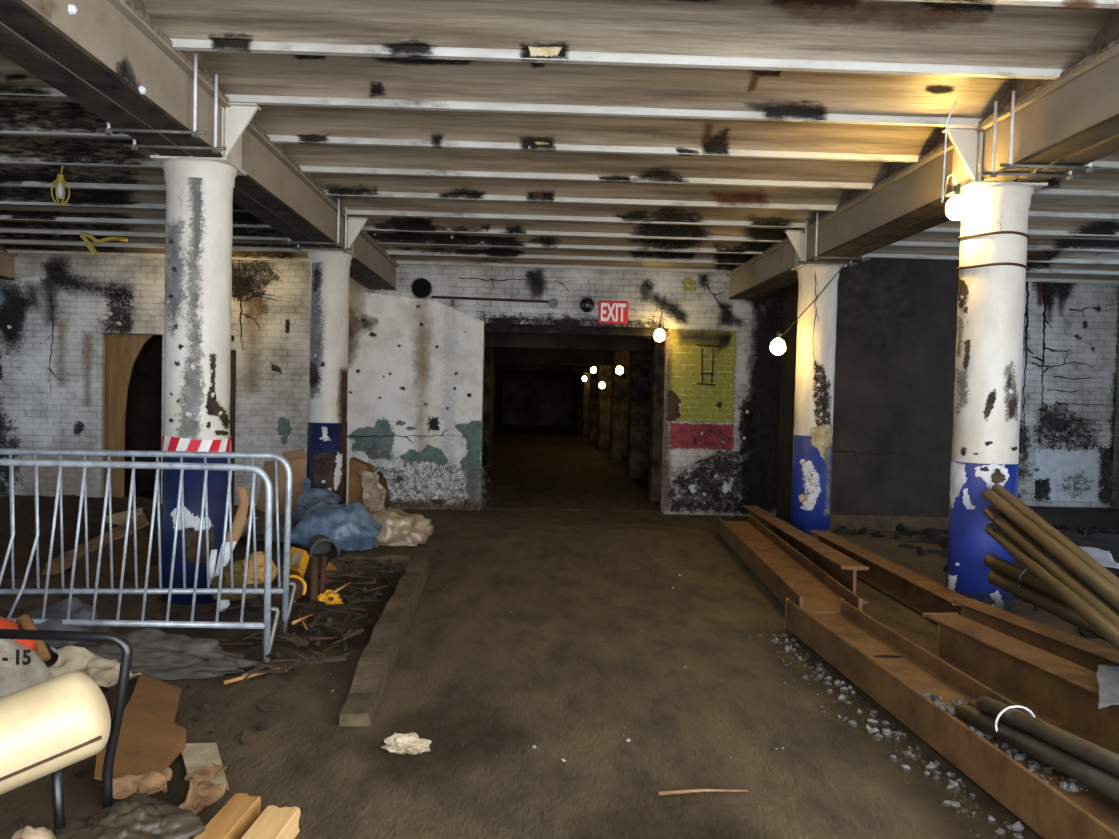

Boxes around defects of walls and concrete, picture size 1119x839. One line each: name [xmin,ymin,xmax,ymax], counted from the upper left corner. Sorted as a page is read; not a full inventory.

damp [1,282,64,379]
damp [32,456,89,495]
damp [232,274,267,389]
peeling [310,403,490,510]
peeling [799,361,833,515]
peeling [950,278,1119,510]
damp [1038,283,1064,321]
crack [1023,282,1112,426]
peeling [948,562,959,592]